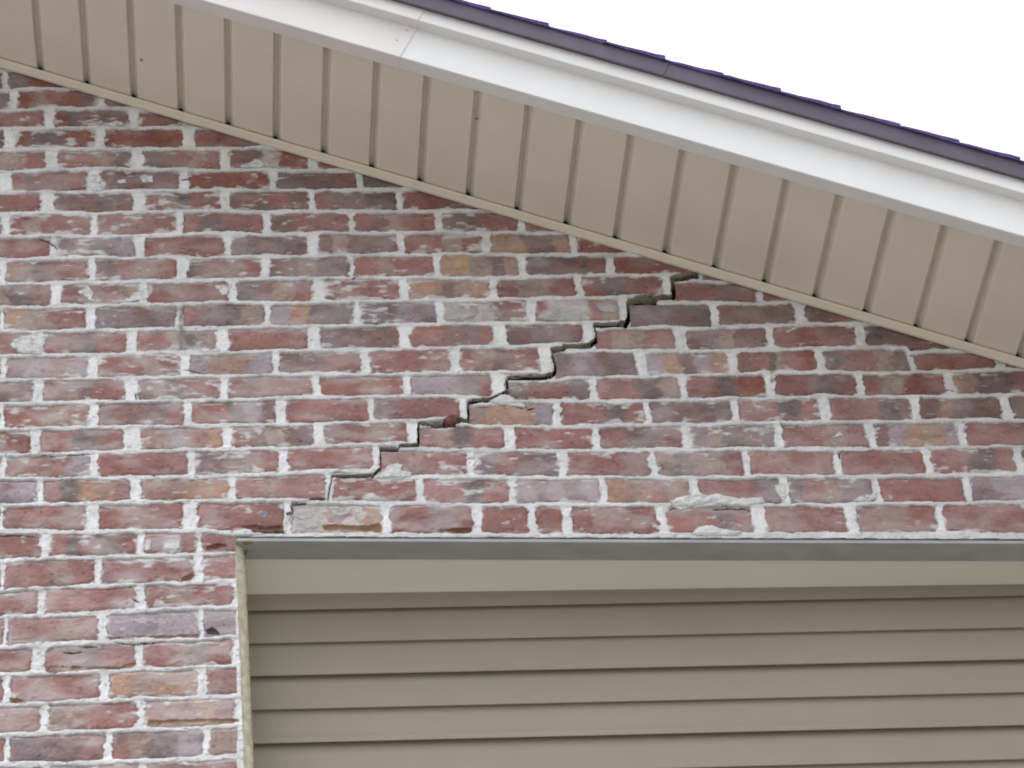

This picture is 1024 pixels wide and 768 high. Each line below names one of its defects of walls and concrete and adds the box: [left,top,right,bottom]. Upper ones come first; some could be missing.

crack [250,271,699,534]